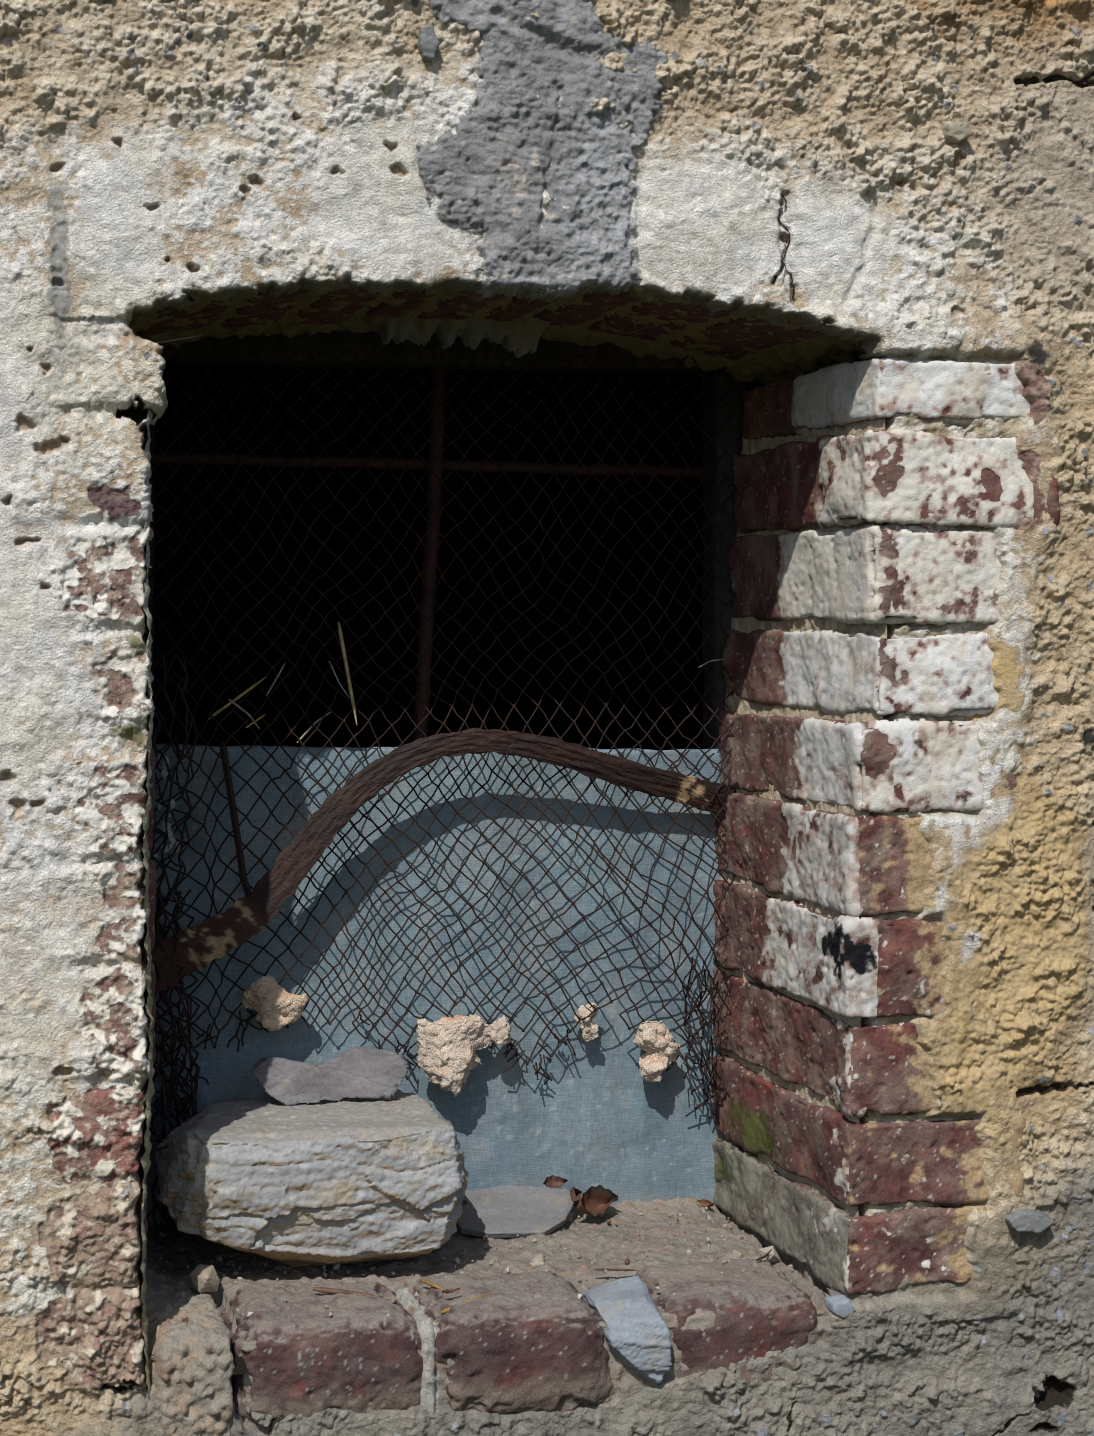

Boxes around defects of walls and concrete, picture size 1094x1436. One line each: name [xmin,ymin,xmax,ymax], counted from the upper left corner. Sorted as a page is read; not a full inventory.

crack [1014,72,1094,88]
crack [773,194,795,301]
spalling [57,483,150,627]
spalling [87,647,153,723]
peeling [758,357,1054,1290]
crack [1016,1082,1094,1093]
crack [231,1348,285,1433]
crack [993,1414,1027,1436]